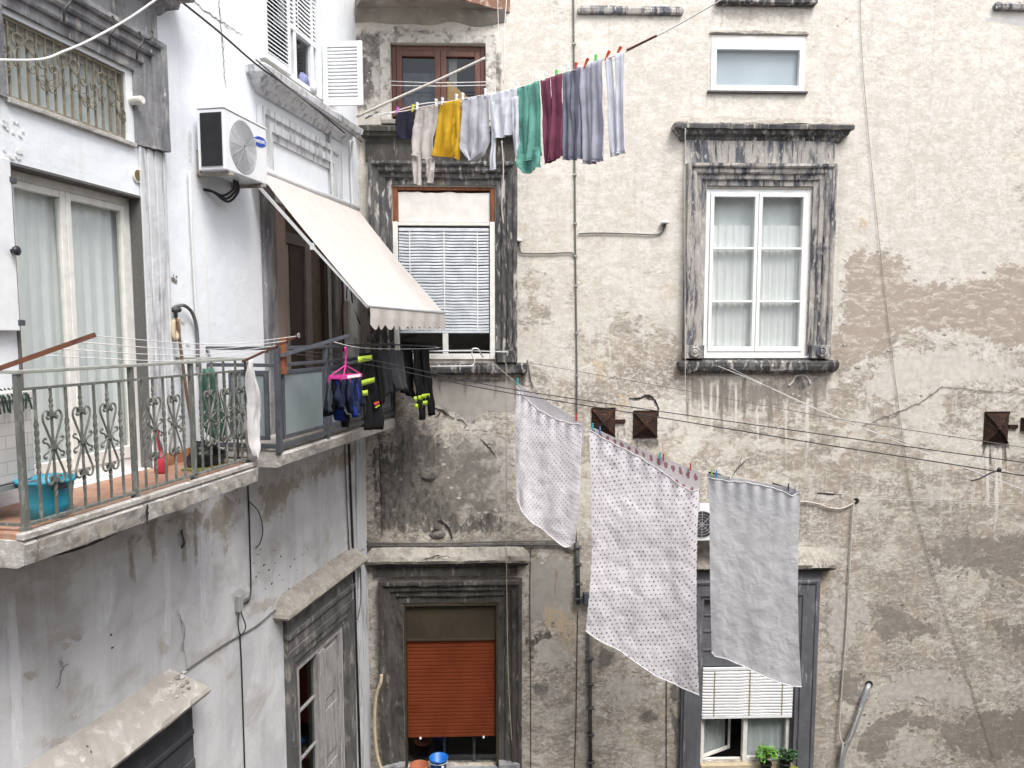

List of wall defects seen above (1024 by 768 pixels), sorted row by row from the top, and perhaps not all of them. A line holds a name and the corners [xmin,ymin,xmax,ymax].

peeling [839,249,1024,406]
peeling [407,375,516,514]
leakage [686,378,827,444]
crack [862,386,1022,427]
leakage [983,443,1009,510]